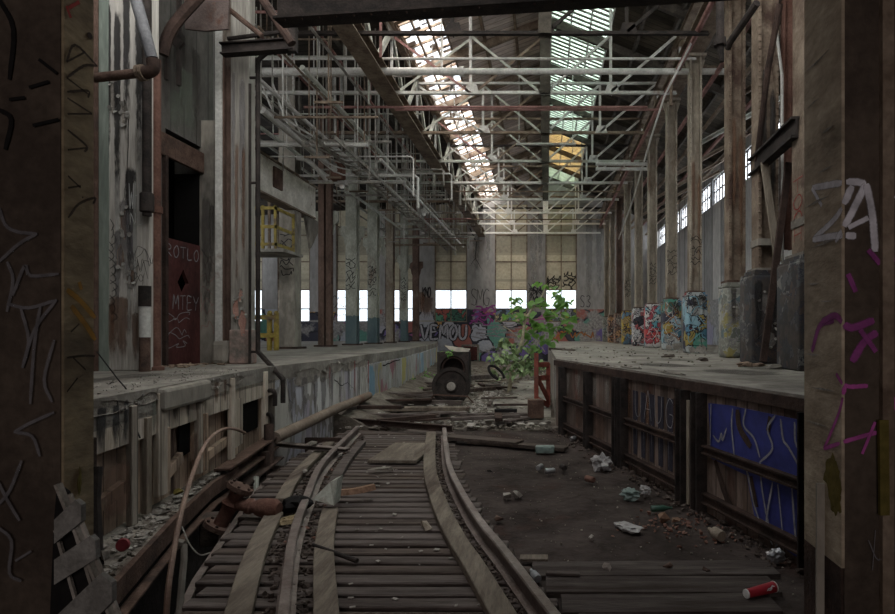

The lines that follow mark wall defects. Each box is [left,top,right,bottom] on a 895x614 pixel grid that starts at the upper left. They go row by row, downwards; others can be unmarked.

water stain [109,0,142,271]
water stain [97,400,129,445]